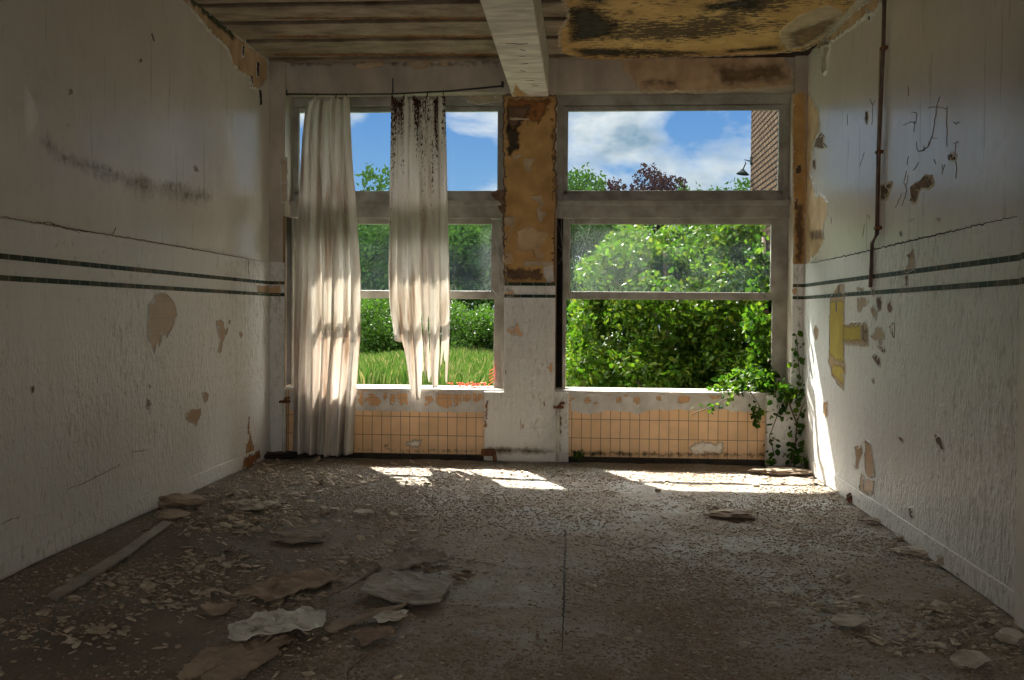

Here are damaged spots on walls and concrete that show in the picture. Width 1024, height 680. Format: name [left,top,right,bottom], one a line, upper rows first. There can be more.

flaking render [179,0,269,106]
flaking render [618,49,828,264]
peeling [910,174,934,205]
crack [895,88,960,208]
flaking render [491,83,765,415]
peeling [146,292,177,353]
peeling [216,318,243,354]
peeling [814,283,893,391]
peeling [355,391,484,413]
peeling [853,438,876,501]